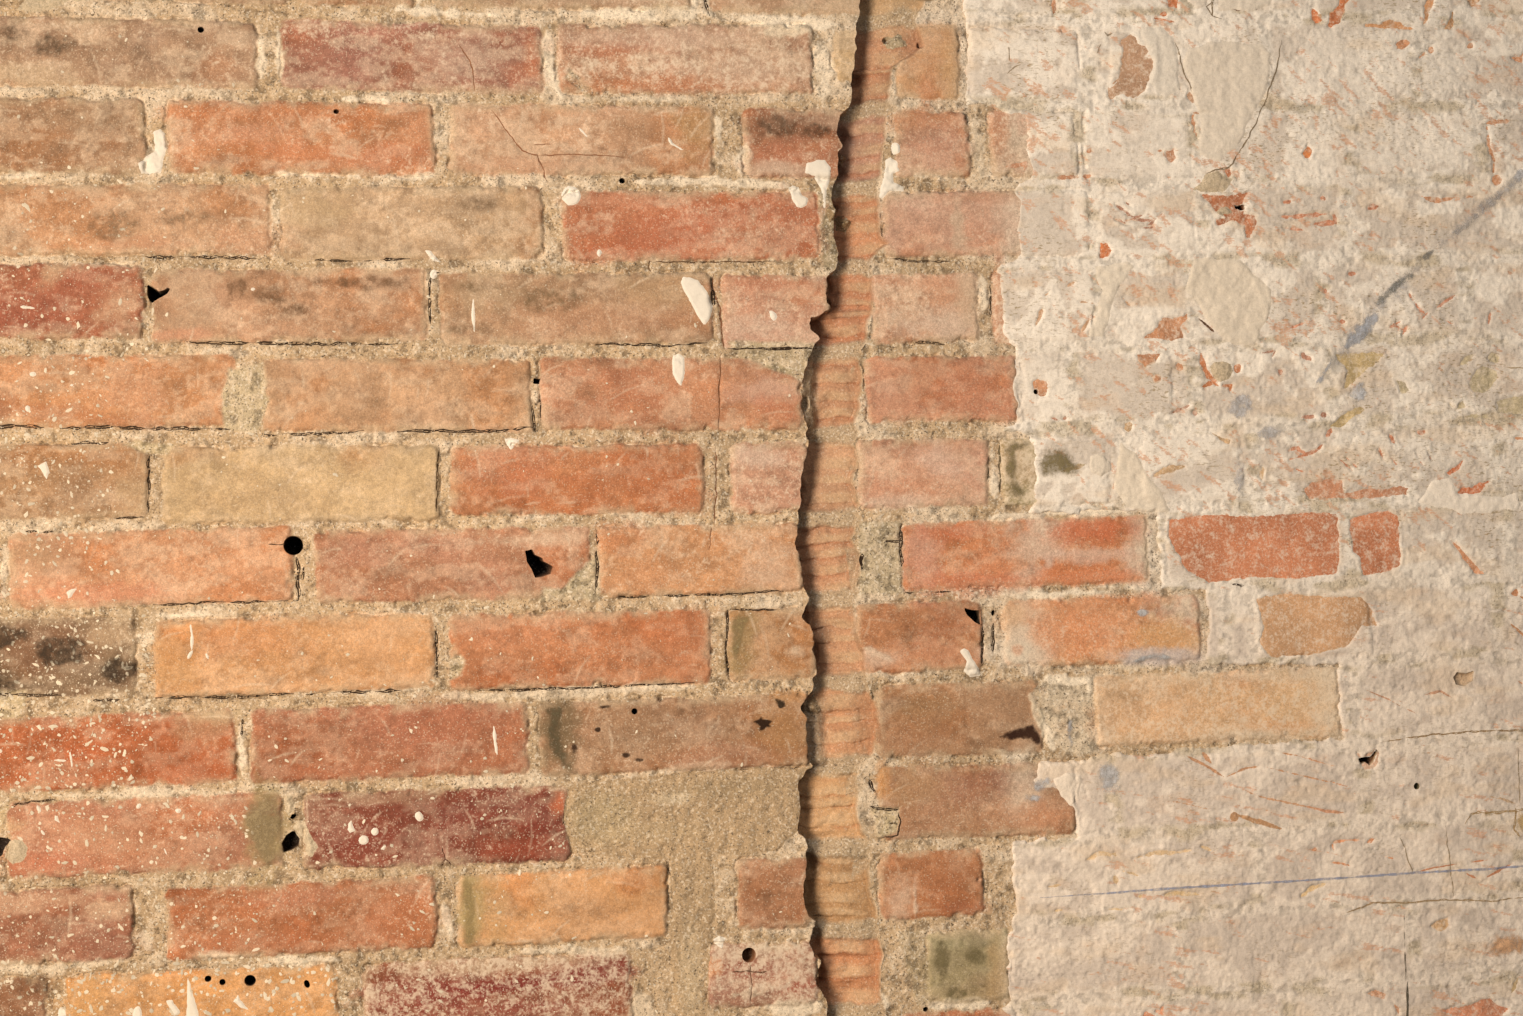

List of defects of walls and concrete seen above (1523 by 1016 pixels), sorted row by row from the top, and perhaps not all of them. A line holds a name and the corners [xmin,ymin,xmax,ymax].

crack [459,0,951,1016]
flaking render [963,0,1523,1016]